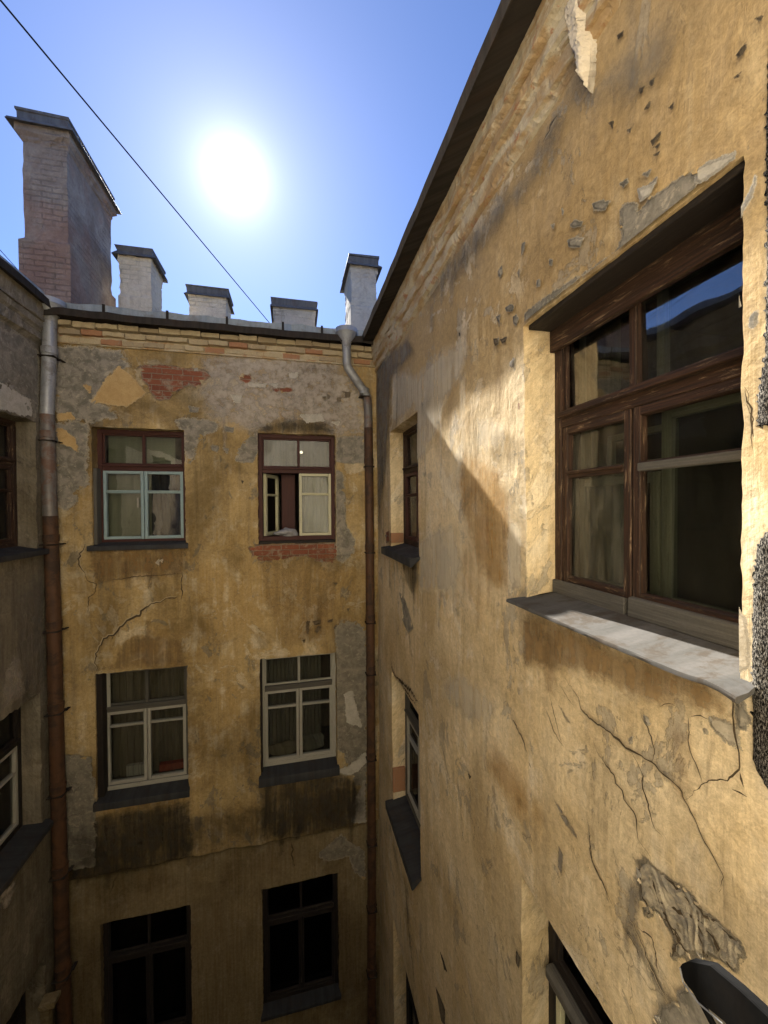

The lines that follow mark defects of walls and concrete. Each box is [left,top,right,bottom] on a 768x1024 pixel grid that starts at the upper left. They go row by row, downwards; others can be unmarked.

flaking render [496,151,737,326]
flaking render [55,344,211,511]
flaking render [230,372,299,403]
flaking render [248,392,365,563]
crack [78,544,183,671]
corrosion [42,516,72,1024]
leakage [71,805,192,880]
leakage [262,777,358,838]
crack [543,680,747,892]
flaking render [628,855,747,974]